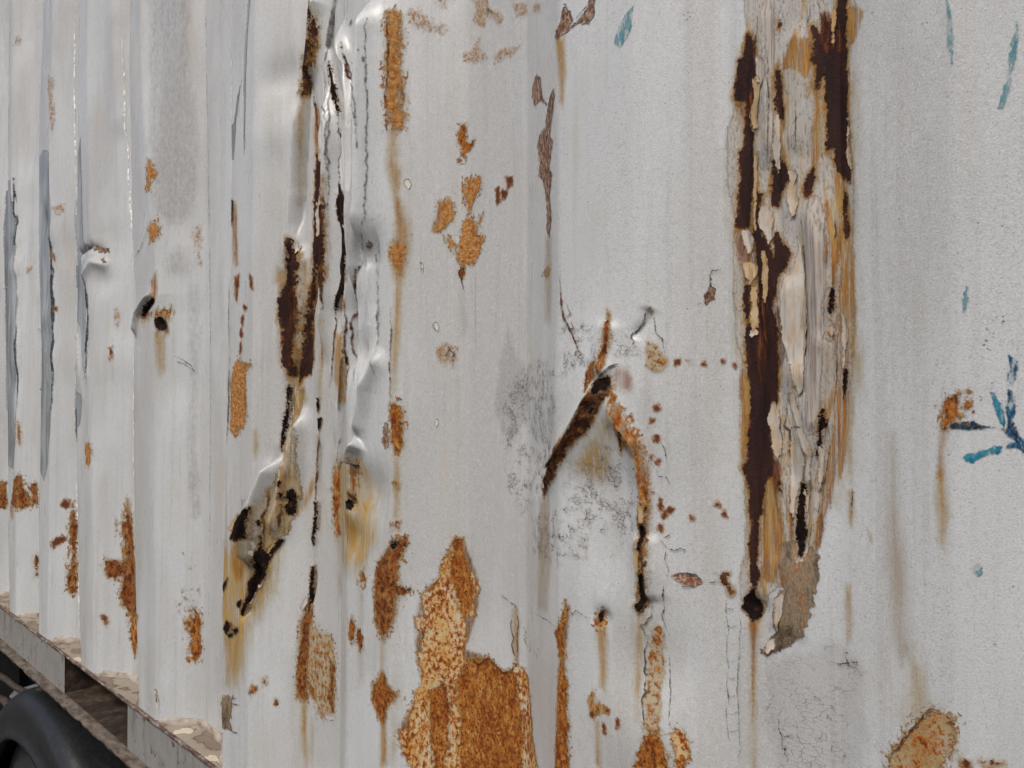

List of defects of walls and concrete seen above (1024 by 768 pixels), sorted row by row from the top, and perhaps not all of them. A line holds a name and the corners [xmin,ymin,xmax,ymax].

corrosion [378,4,442,132]
corrosion [432,123,513,287]
corrosion [226,275,253,440]
peeling [726,0,863,656]
corrosion [0,471,38,512]
corrosion [606,377,675,533]
corrosion [100,503,138,659]
corrosion [293,606,339,723]
corrosion [330,457,538,768]
corrosion [553,598,572,768]
corrosion [633,625,694,768]
corrosion [881,701,1005,768]